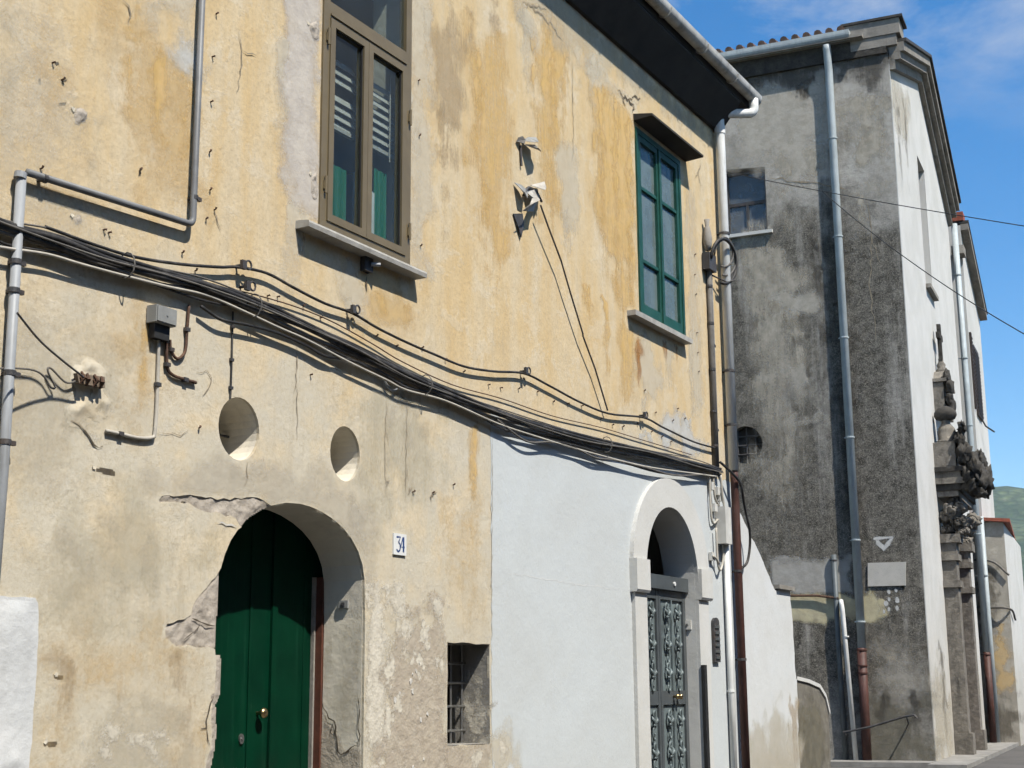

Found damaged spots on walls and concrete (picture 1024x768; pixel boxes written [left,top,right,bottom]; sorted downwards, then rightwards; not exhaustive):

crack [523,1,574,152]
water stain [737,54,889,187]
water stain [518,5,671,402]
water stain [740,222,836,500]
flaking render [159,495,269,527]
crack [322,700,361,755]
peeling [320,581,448,768]